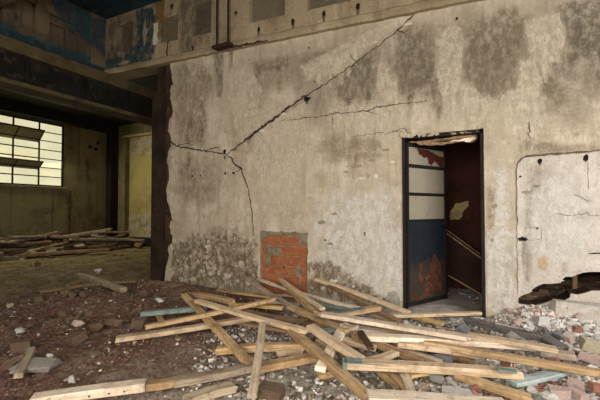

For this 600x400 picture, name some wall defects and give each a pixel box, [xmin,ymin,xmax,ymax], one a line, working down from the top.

peeling [0,0,162,71]
crack [169,14,426,234]
water stain [300,18,400,87]
water stain [329,63,400,140]
peeling [417,148,444,167]
water stain [434,12,565,137]
flaking render [449,201,469,220]
flaking render [168,230,258,291]
spalling [518,268,594,295]